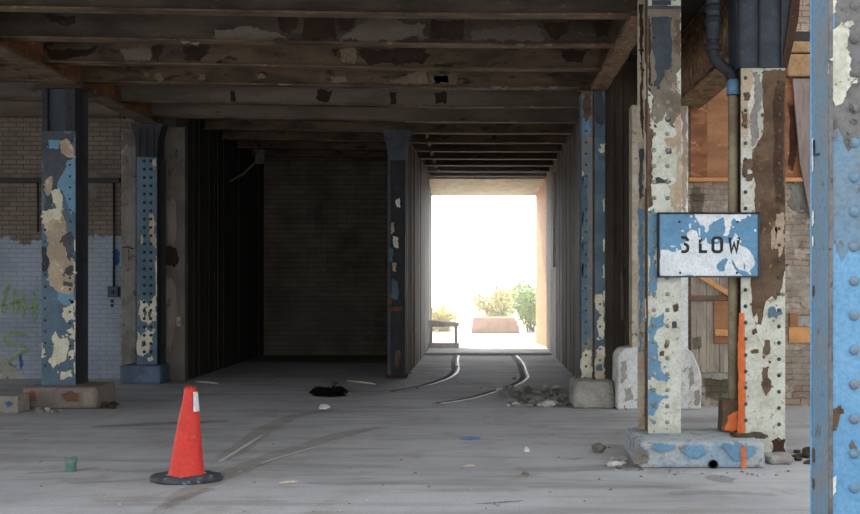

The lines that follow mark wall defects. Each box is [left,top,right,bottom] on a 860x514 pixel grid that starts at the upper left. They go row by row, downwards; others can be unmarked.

peeling [41,131,77,380]
peeling [136,214,179,362]
peeling [213,26,288,40]
peeling [339,18,425,64]
peeling [388,222,399,300]
peeling [580,171,606,380]
peeling [620,0,688,421]
peeling [741,70,763,152]
rust [741,69,797,335]
peeling [828,0,860,261]
peeling [632,443,706,464]
peeling [721,443,756,461]